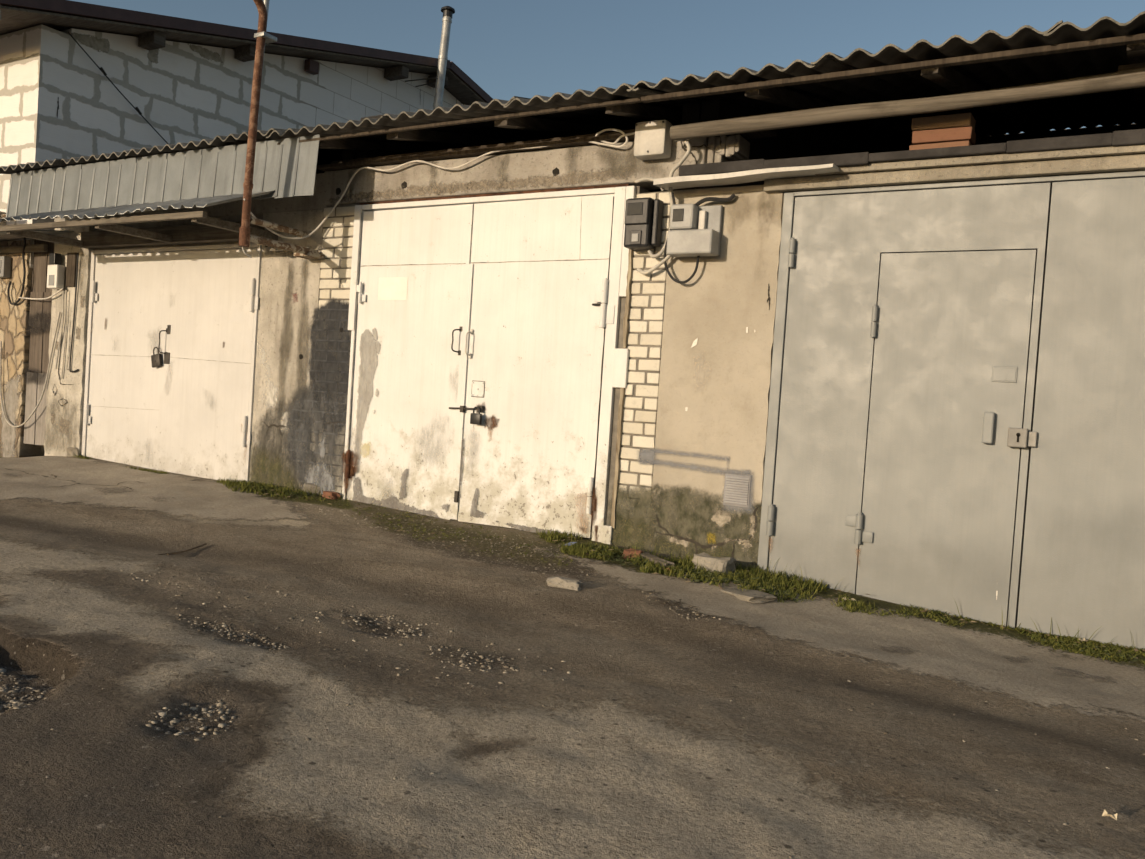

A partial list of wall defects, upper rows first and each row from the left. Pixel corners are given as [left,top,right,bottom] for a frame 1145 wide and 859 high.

water stain [257,247,311,428]
peeling [355,328,380,460]
rust [477,404,498,430]
rust [342,452,357,492]
peeling [352,439,555,534]